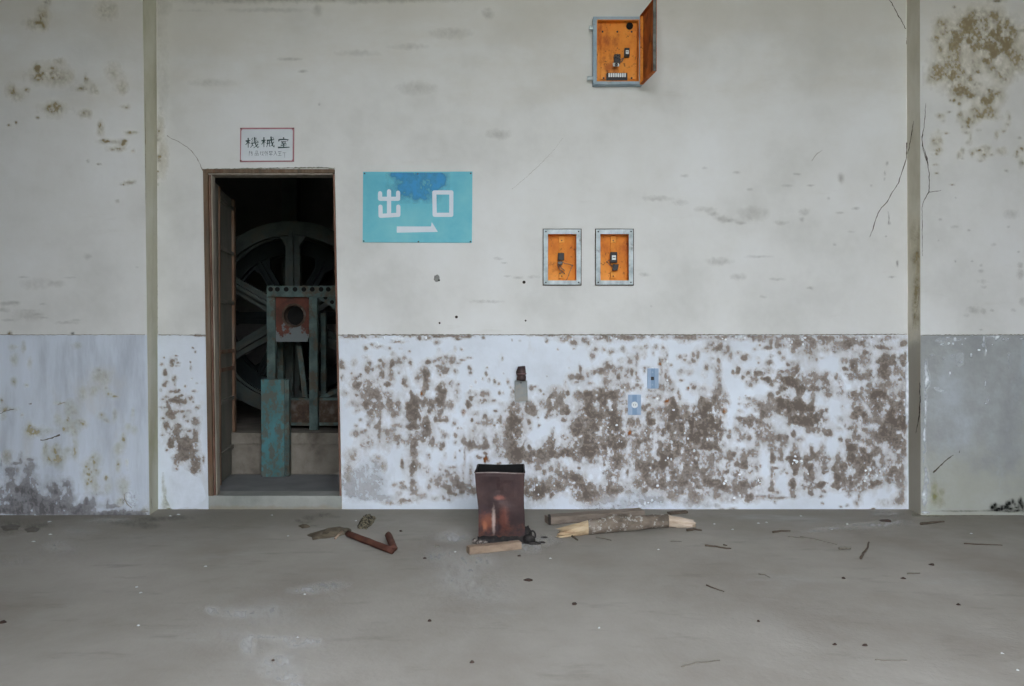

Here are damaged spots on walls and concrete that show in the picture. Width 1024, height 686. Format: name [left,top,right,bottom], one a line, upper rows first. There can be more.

water stain [930,0,1023,128]
crack [870,106,941,256]
water stain [0,458,146,515]
water stain [500,390,531,464]